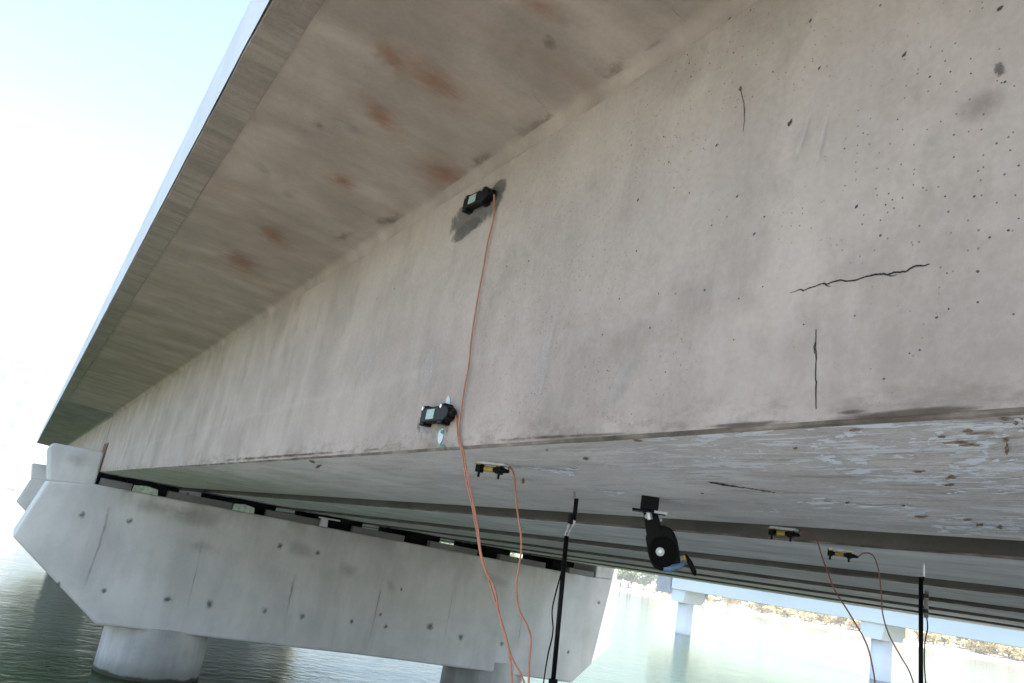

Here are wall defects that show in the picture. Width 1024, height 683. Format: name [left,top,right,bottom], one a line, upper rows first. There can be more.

crack [790,264,929,293]
crack [811,332,819,409]
peeling [804,418,1024,495]
peeling [797,497,1024,535]